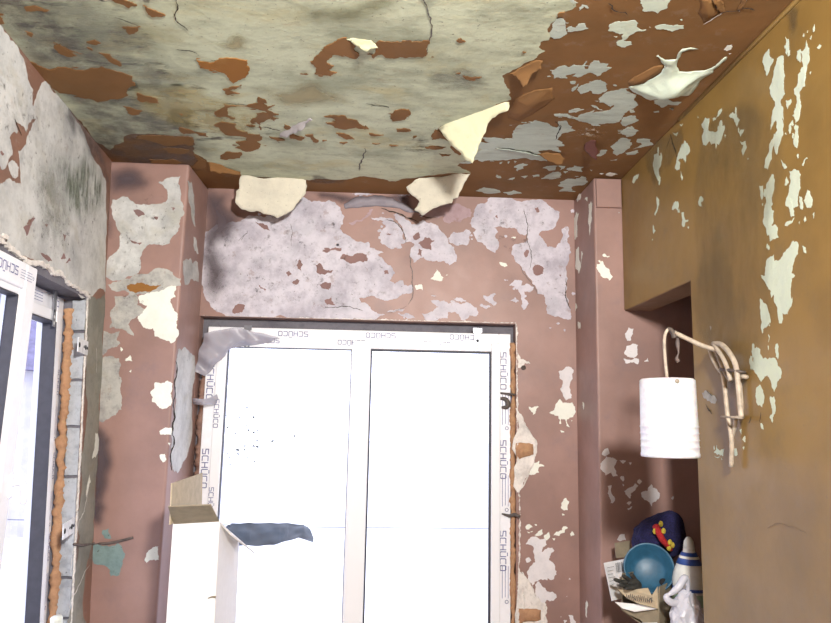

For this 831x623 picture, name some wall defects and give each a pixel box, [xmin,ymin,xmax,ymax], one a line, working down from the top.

water stain [3,0,107,70]
crack [393,0,433,51]
peeling [608,20,645,47]
peeling [640,0,670,14]
crack [705,0,755,24]
peeling [547,45,733,160]
water stain [68,94,195,164]
peeling [702,107,749,159]
peeling [749,24,821,430]
peeling [596,254,613,280]
peeling [0,0,589,623]
peeling [624,328,648,364]